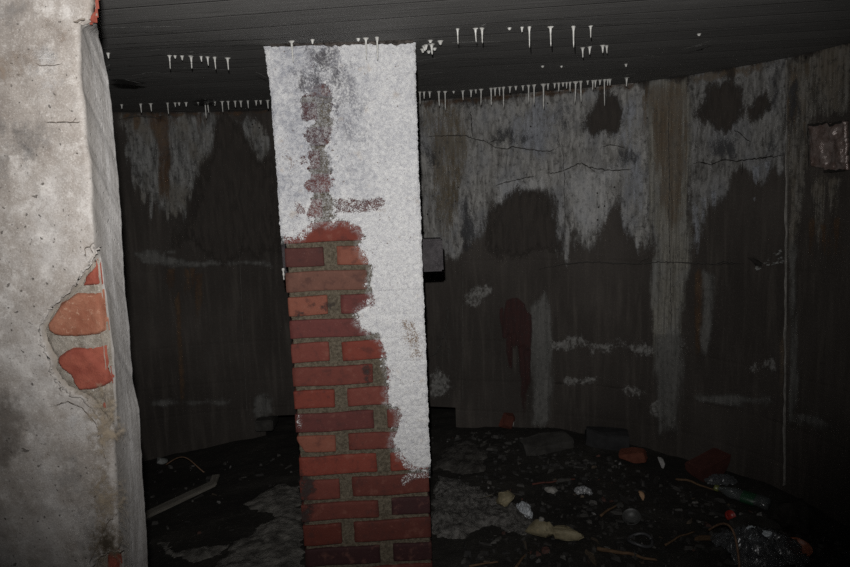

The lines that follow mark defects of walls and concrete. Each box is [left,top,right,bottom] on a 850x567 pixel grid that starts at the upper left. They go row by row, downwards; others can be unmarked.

water stain [270,40,413,60]
spalling [38,246,115,422]
water stain [120,109,283,267]
peeling [263,42,431,483]
crack [428,112,630,232]
water stain [417,44,850,432]